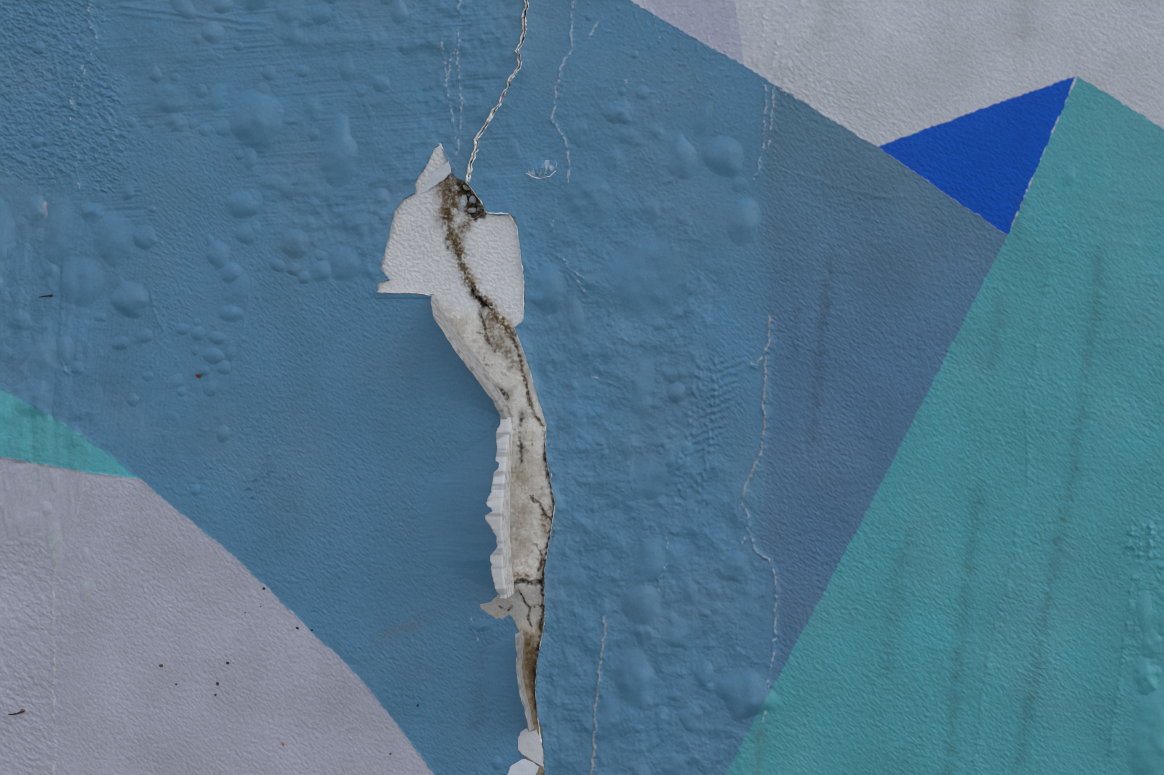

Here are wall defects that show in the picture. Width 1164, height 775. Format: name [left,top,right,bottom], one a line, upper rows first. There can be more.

crack [549,0,605,184]
crack [751,0,807,183]
peeling [377,143,555,775]
crack [438,0,555,705]
crack [740,315,782,725]